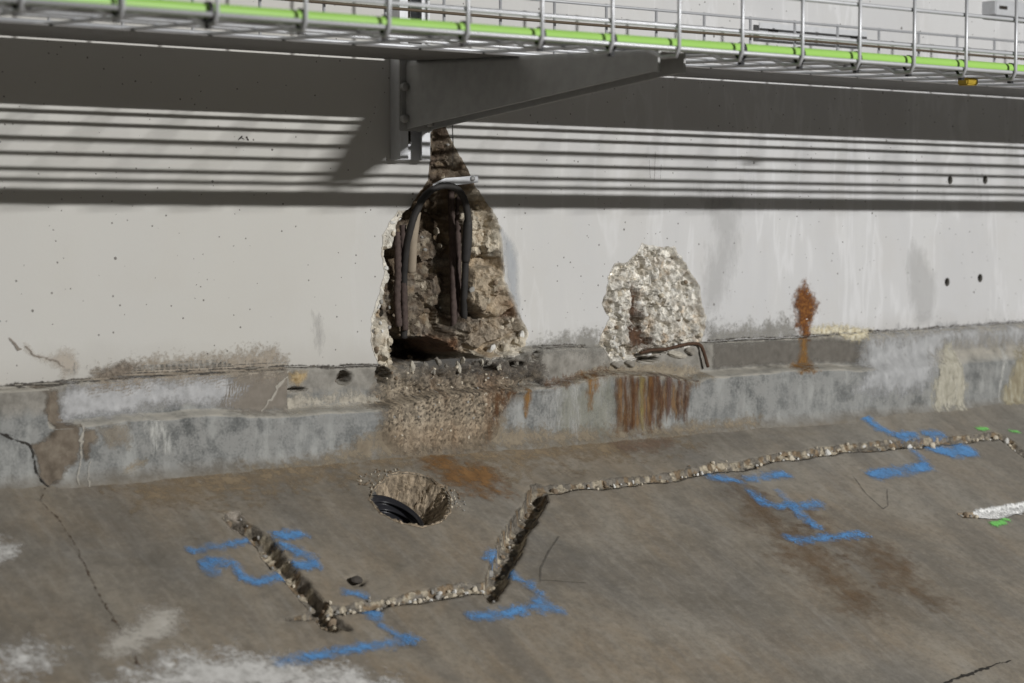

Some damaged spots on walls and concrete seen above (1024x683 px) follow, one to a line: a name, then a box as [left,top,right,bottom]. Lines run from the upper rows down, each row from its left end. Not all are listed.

spalling [370,127,548,456]
spalling [598,243,707,368]
corrosion [792,281,819,373]
corrosion [544,368,698,451]
crack [0,433,141,668]